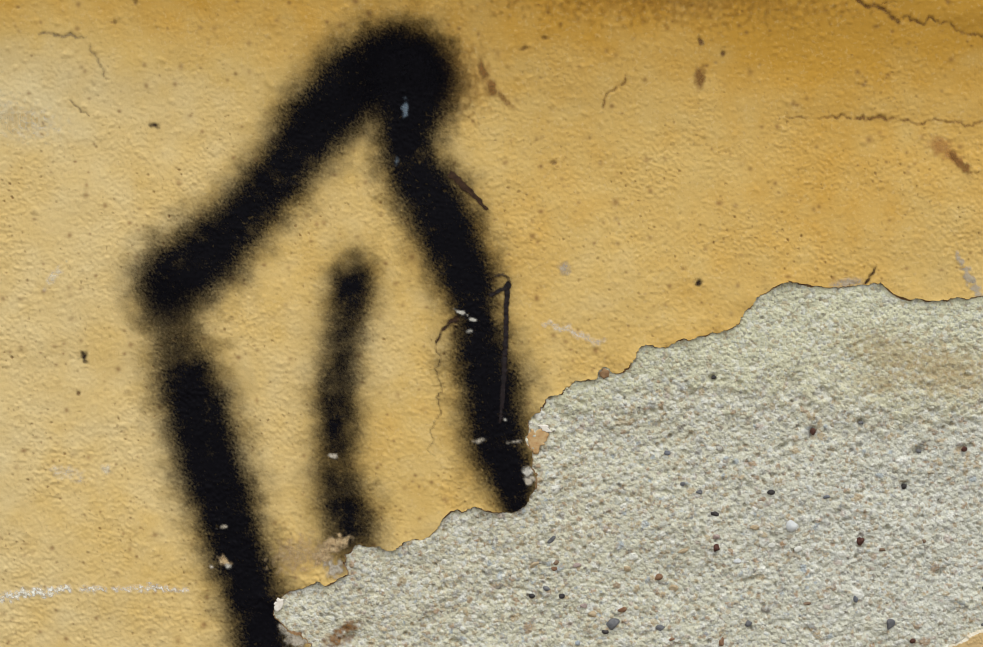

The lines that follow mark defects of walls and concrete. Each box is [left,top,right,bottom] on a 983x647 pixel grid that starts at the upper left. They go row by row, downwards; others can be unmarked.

crack [857,0,982,37]
spalling [273,281,983,647]